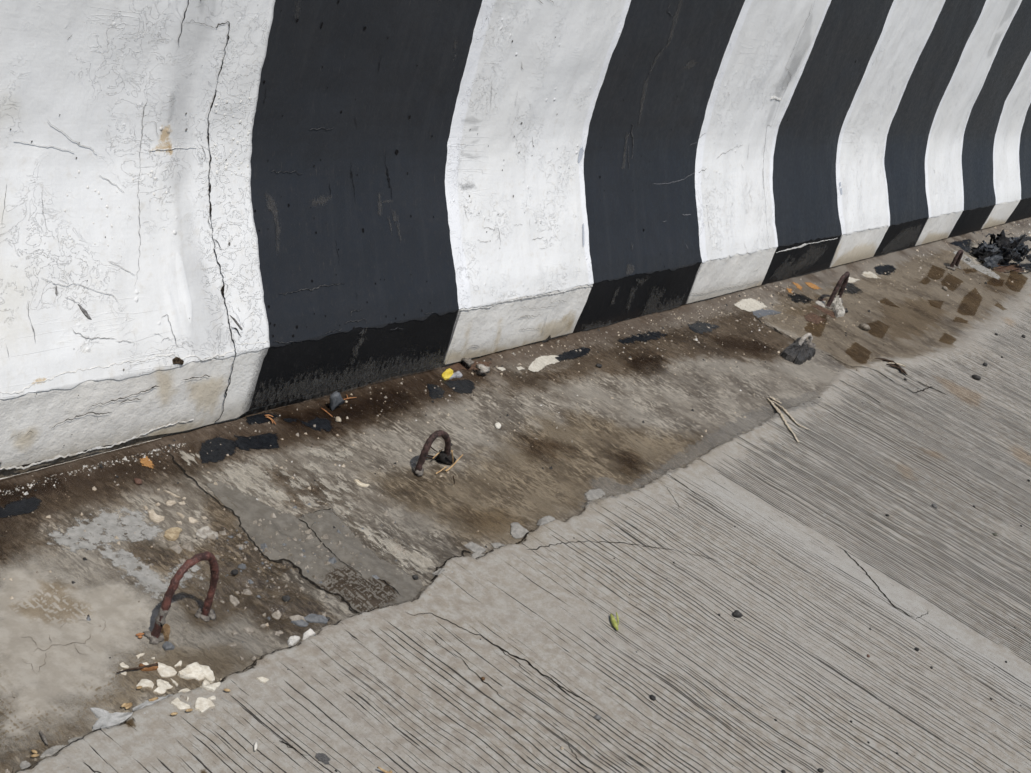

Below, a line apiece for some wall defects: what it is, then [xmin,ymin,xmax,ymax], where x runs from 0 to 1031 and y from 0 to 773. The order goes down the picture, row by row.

crack [178,0,241,422]
crack [21,386,159,433]
crack [170,454,590,705]
crack [844,550,926,618]
crack [190,645,295,725]